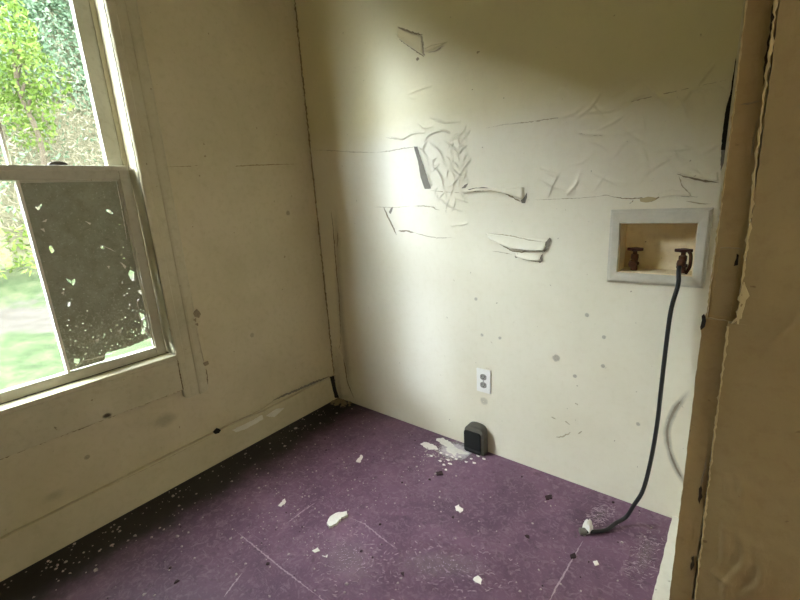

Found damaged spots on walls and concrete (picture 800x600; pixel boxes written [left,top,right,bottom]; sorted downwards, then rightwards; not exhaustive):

peeling [396,27,446,61]
peeling [419,148,433,186]
peeling [462,184,527,203]
peeling [486,233,551,263]